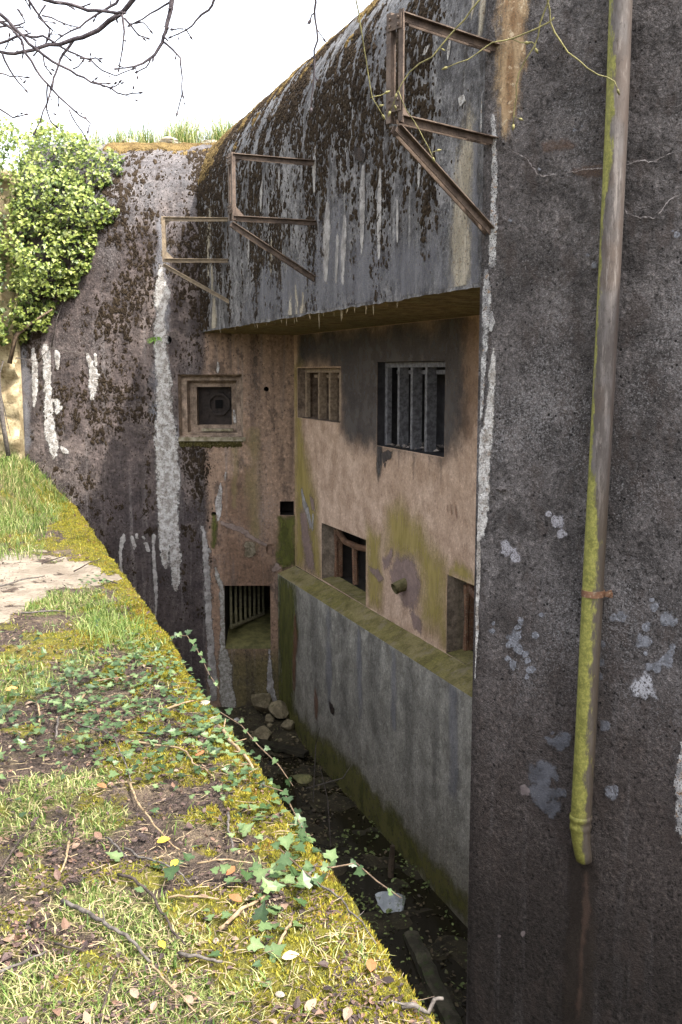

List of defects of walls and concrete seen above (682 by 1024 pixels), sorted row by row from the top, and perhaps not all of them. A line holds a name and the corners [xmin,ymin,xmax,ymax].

corrosion [496,0,528,135]
damp [254,93,483,319]
efflorescence [31,344,69,458]
efflorescence [119,264,182,617]
damp [200,472,236,708]
damp [266,317,468,920]
damp [367,348,496,668]
peeling [500,541,520,562]
peeling [489,617,539,680]
peeling [546,511,567,538]
peeling [636,598,678,673]
peeling [529,760,567,819]